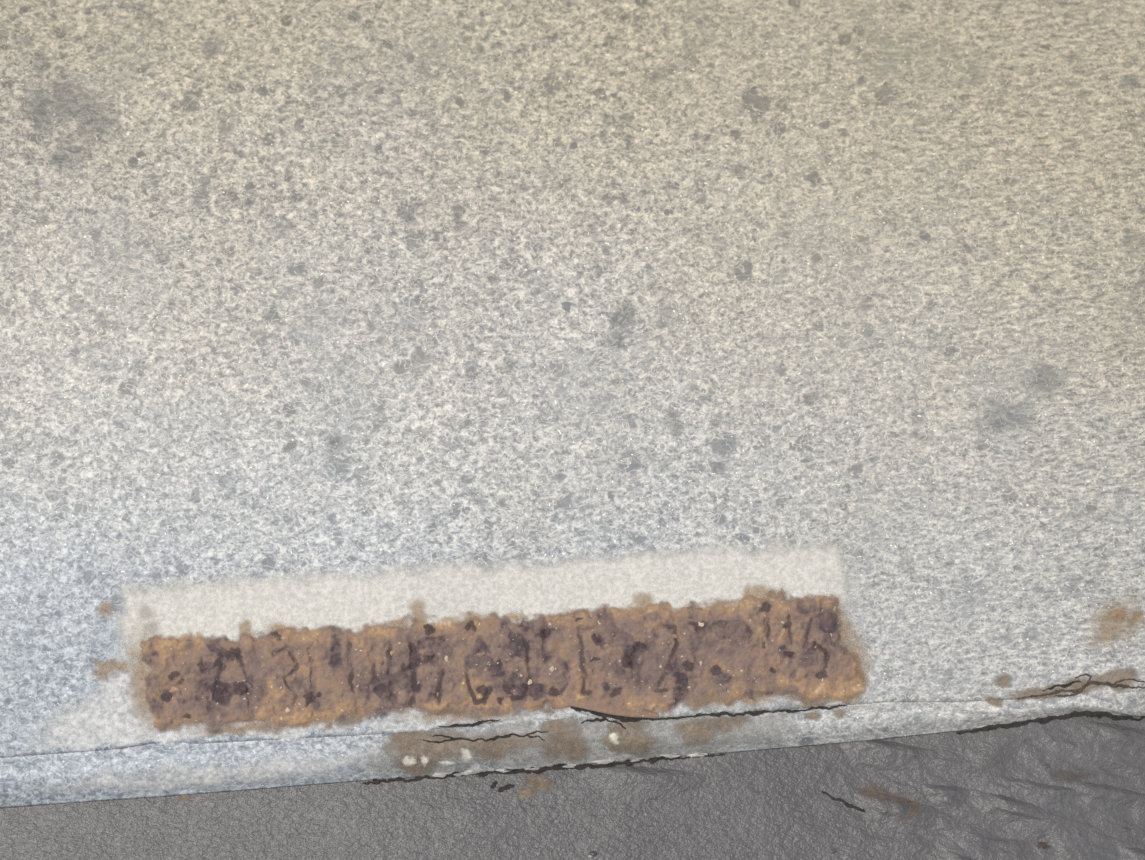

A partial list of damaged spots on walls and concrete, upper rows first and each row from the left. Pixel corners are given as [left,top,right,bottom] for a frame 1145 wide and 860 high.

corrosion [98,586,865,776]
crack [956,674,1145,734]